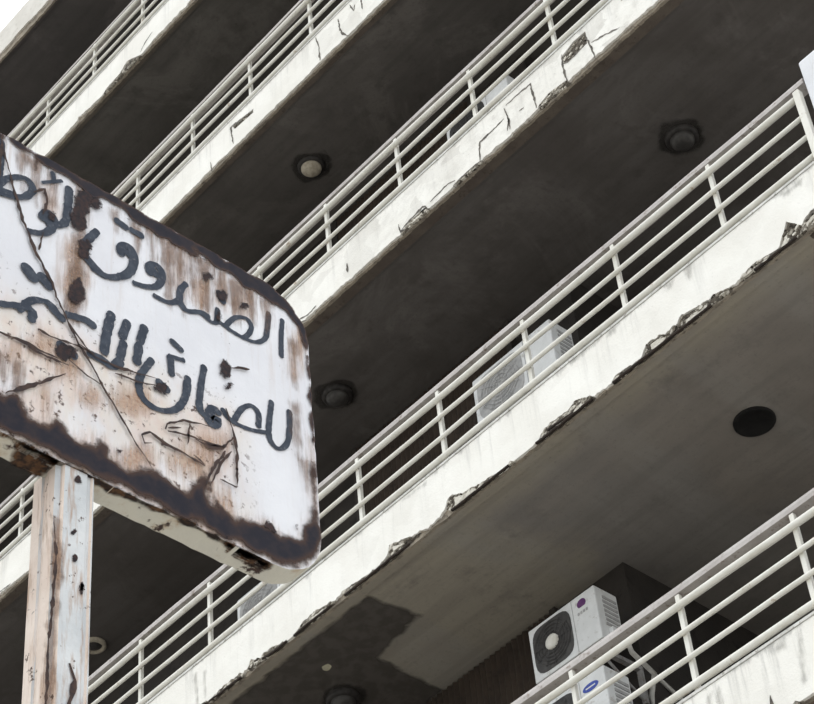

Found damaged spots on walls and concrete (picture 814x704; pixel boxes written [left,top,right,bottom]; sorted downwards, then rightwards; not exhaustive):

crack [338,0,363,36]
crack [561,28,618,83]
crack [398,83,537,233]
spalling [740,210,814,282]
spalling [612,287,733,385]
spalling [535,396,596,445]
spalling [447,460,517,512]
corrosion [43,518,63,704]
damp [233,596,442,704]